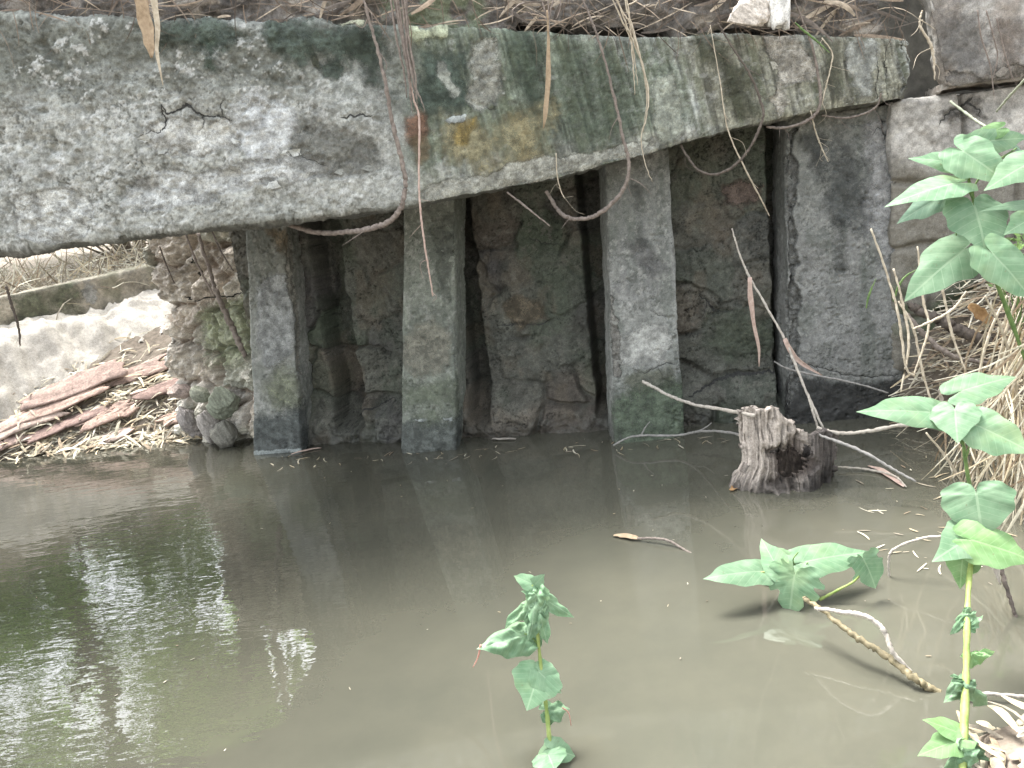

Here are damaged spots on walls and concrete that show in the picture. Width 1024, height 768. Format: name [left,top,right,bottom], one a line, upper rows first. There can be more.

crack [140,99,232,136]
damp [153,17,243,71]
damp [231,93,298,161]
damp [261,18,391,85]
damp [411,50,472,118]
damp [649,74,685,142]
damp [696,34,760,117]
damp [821,36,880,98]